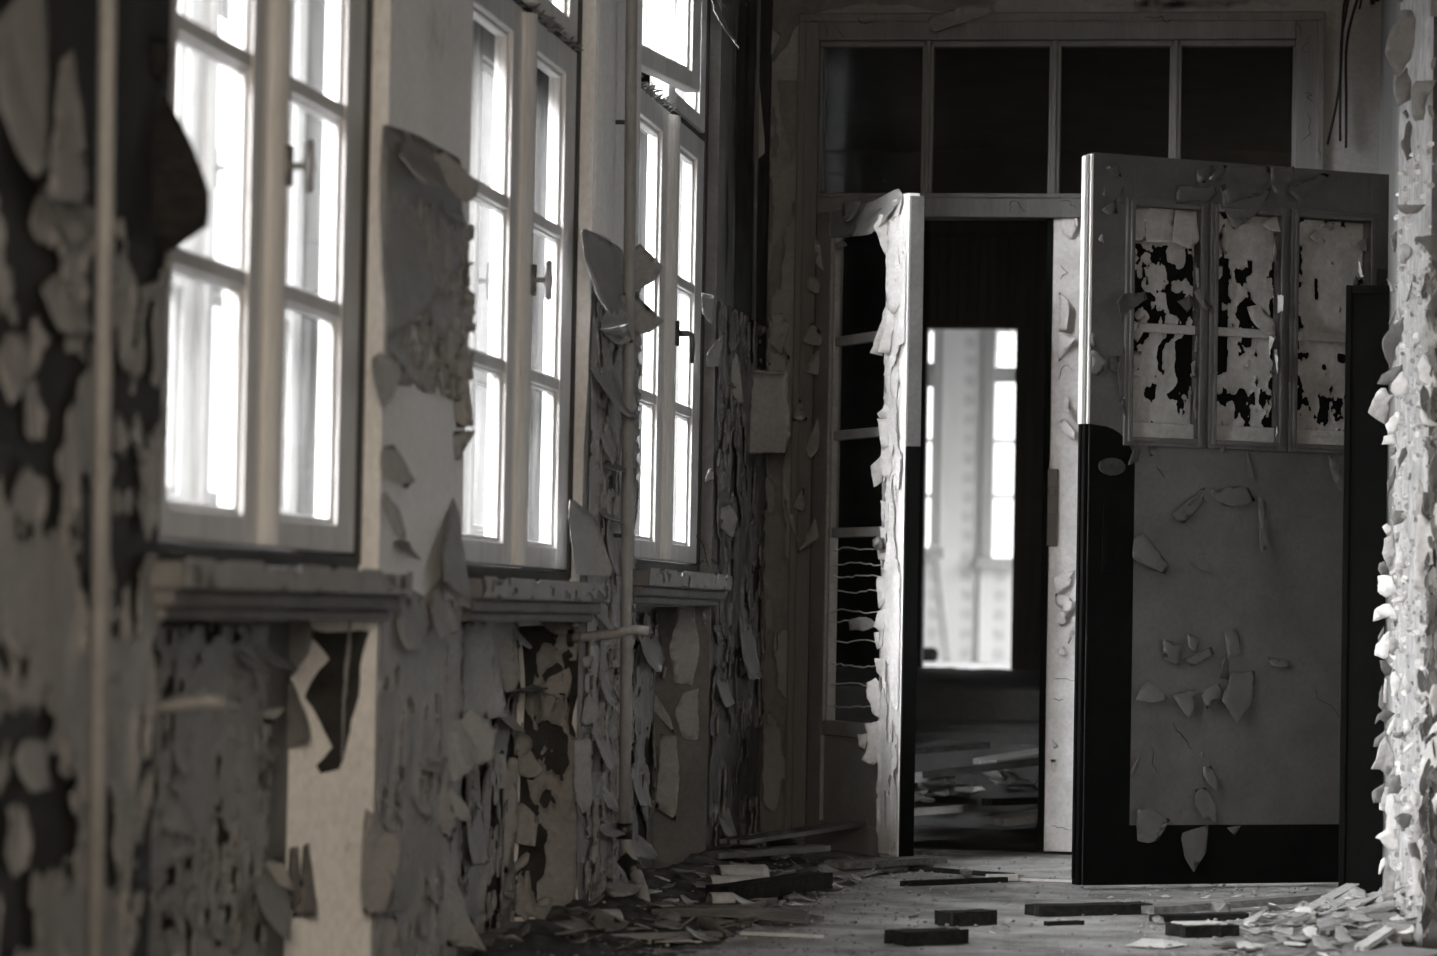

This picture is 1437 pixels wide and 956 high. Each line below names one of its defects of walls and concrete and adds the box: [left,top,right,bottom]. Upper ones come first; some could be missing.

peeling [1058,163,1367,440]
peeling [0,0,96,956]
peeling [105,0,822,956]
peeling [807,189,906,855]
peeling [1054,570,1075,655]
peeling [1133,532,1169,574]
peeling [1136,808,1170,843]
peeling [1136,629,1255,723]
peeling [1181,751,1241,872]
peeling [1368,0,1437,938]